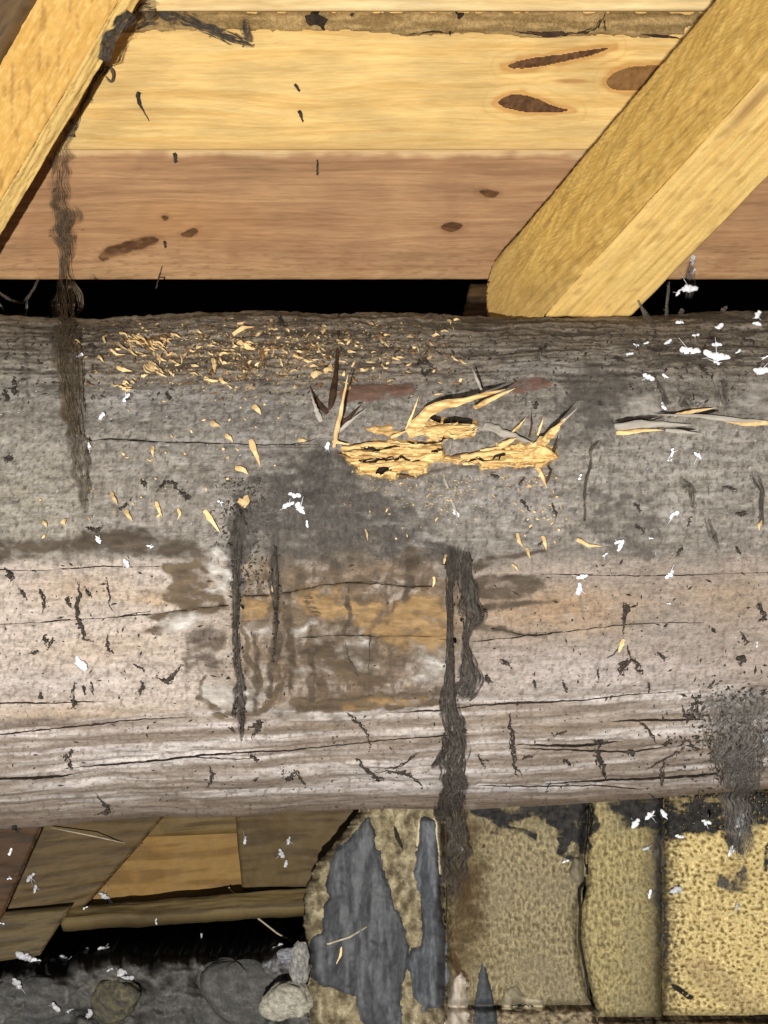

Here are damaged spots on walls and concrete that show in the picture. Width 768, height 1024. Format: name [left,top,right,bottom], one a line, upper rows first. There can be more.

damp [51,334,79,433]
spalling [310,368,575,488]
damp [302,450,331,504]
damp [0,496,460,720]
damp [473,550,546,611]
crack [0,691,705,780]
peeling [415,816,442,875]
damp [504,824,537,840]
damp [723,834,743,850]